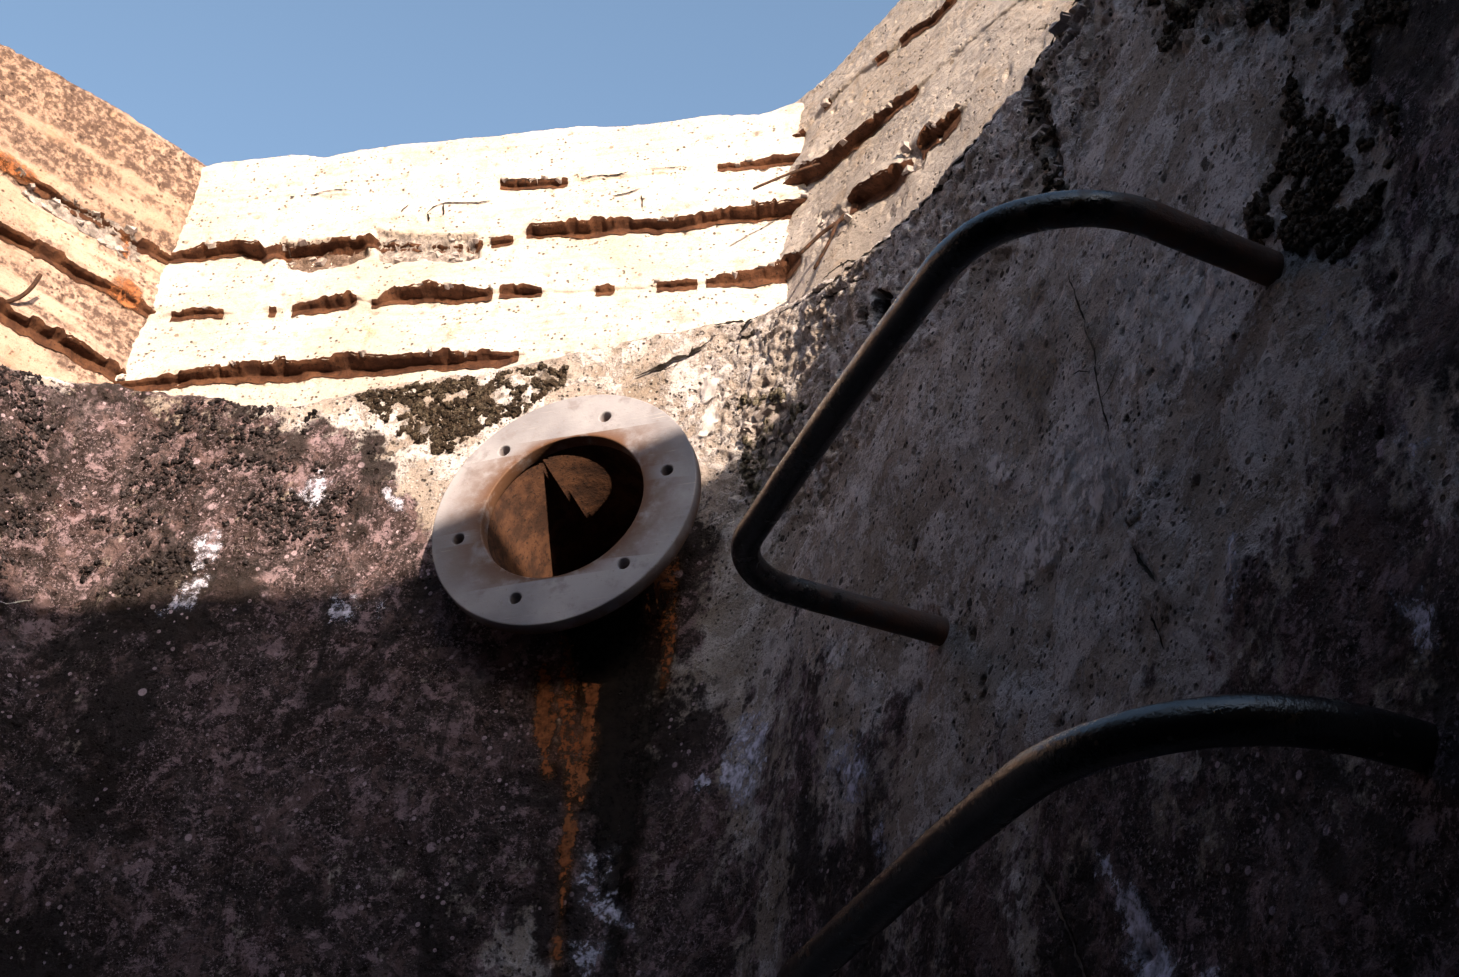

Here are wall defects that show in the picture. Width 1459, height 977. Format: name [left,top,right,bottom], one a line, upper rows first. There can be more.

spalling [899,141,925,176]
spalling [15,167,142,262]
spalling [279,230,481,273]
crack [1068,273,1116,450]
crack [1125,488,1155,581]
corrosion [644,557,681,692]
crack [1151,617,1164,649]
corrosion [532,630,602,976]